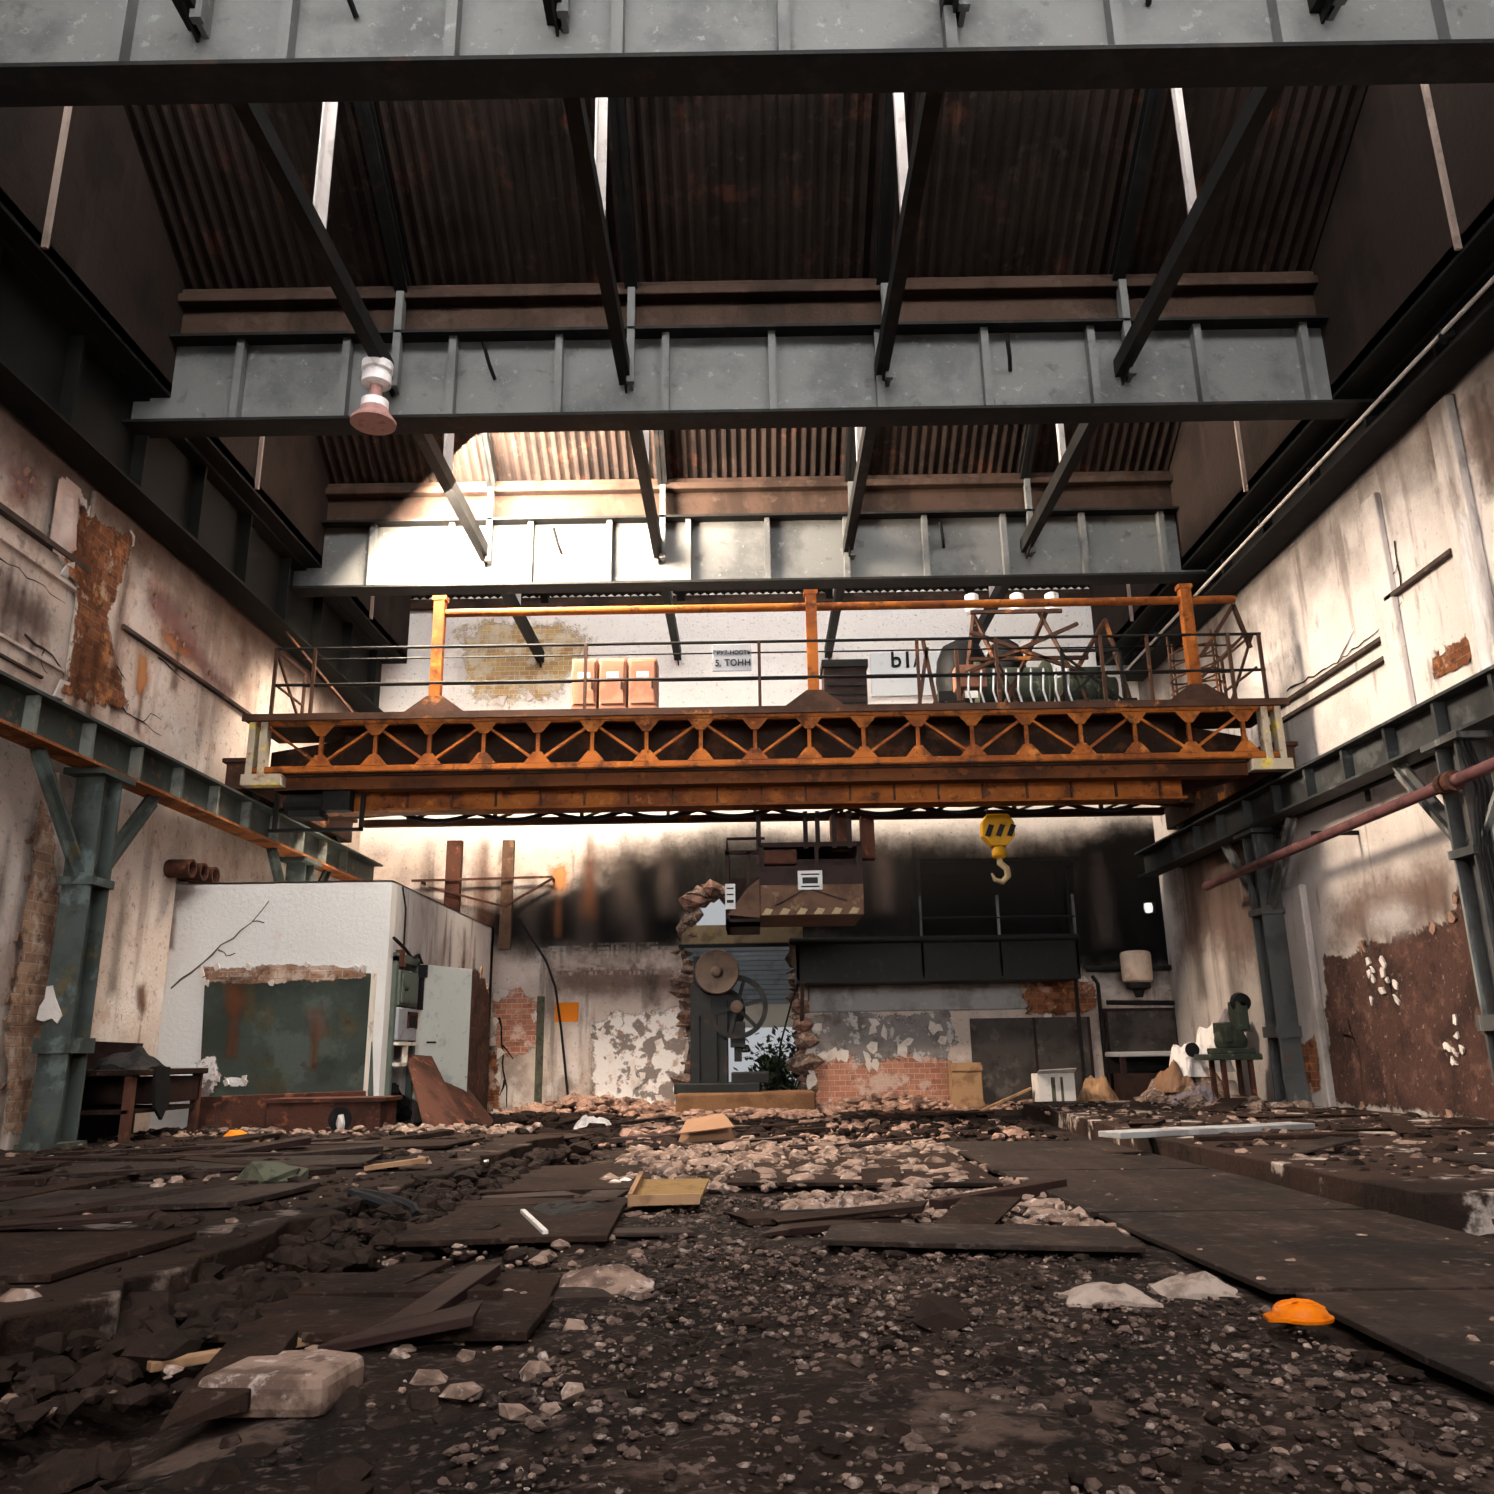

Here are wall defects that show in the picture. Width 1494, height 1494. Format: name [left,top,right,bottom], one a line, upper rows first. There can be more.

water stain [1468,402,1494,480]
crack [0,558,65,603]
crack [24,633,64,676]
flaking render [53,497,135,716]
flaking render [453,617,589,706]
flaking render [1428,632,1472,679]
flaking render [0,800,60,1135]
peeling [197,961,367,987]
flaking render [458,966,537,1114]
peeling [590,879,725,1105]
peeling [785,950,959,1105]
flaking render [1302,886,1494,1121]